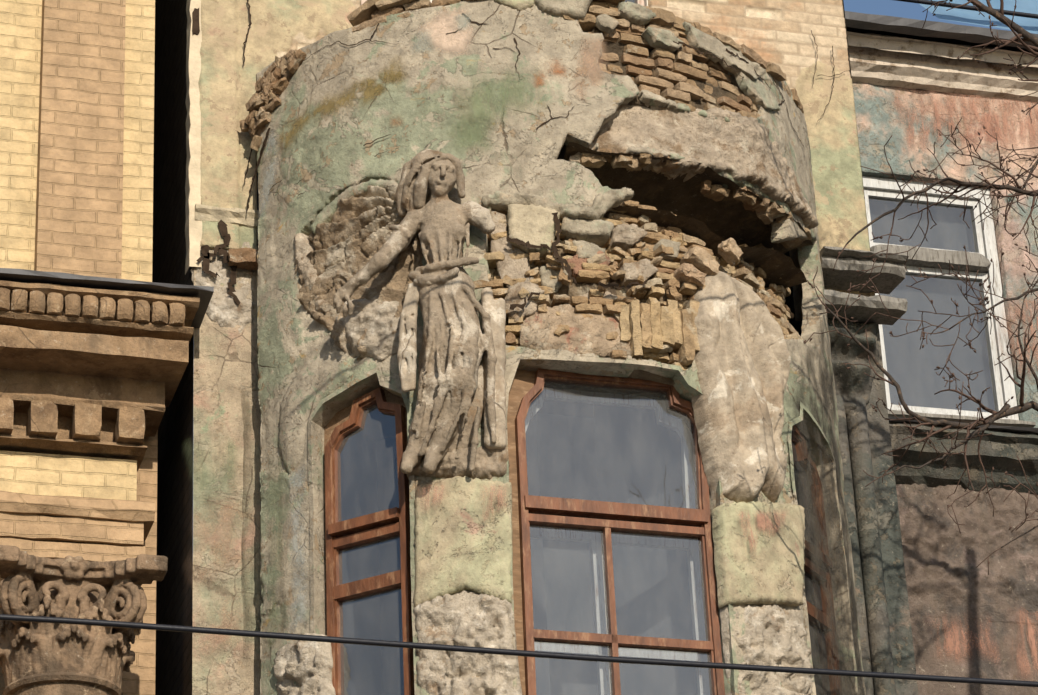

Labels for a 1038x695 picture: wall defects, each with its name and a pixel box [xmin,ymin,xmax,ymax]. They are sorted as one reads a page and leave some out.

crack [243,0,252,64]
crack [446,13,486,34]
crack [493,38,521,78]
spalling [494,0,781,118]
spalling [239,49,306,151]
crack [536,105,573,129]
spalling [481,142,813,289]